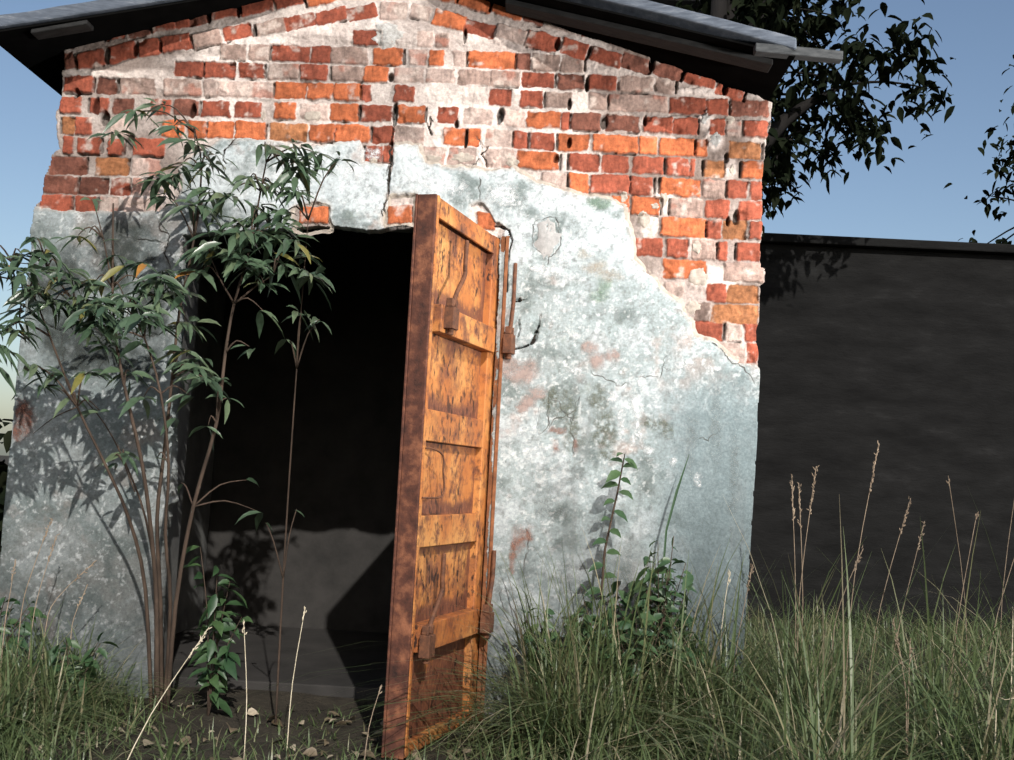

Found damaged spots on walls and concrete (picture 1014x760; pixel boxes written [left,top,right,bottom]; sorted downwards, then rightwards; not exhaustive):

flaking render [710,132,722,148]
crack [381,128,395,217]
spalling [290,203,334,236]
spalling [383,192,416,228]
flaking render [395,141,740,362]
crack [591,355,667,387]
crack [536,397,580,456]